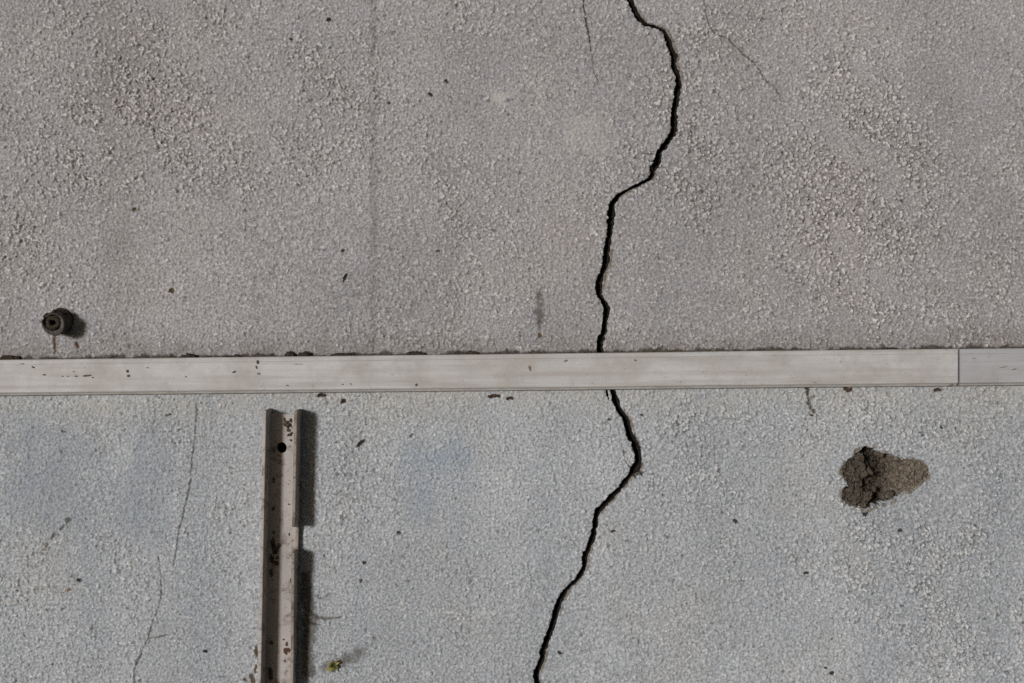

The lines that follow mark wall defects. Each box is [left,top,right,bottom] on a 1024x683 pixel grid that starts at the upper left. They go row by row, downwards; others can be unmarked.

crack [582,0,598,80]
crack [595,0,683,353]
crack [533,390,643,683]
spalling [839,445,930,516]